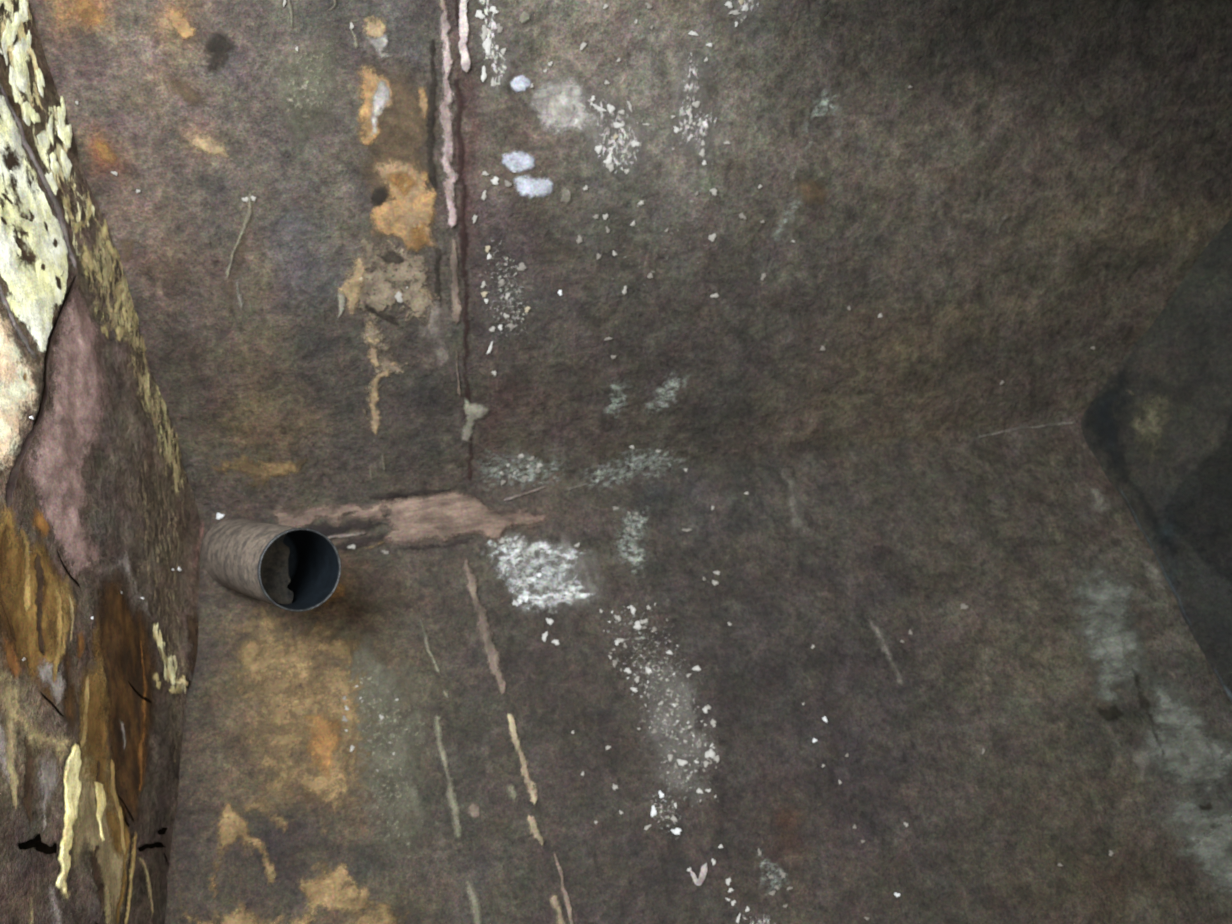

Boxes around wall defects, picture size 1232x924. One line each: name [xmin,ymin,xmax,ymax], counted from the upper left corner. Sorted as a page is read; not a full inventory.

spalling [0,0,188,761]
rust [365,321,396,435]
rust [357,16,441,316]
rust [454,80,473,480]
damp [475,0,508,87]
damp [584,80,650,175]
damp [723,0,760,31]
rust [0,505,156,819]
damp [273,491,720,845]
damp [1074,562,1232,892]
rust [186,863,398,924]